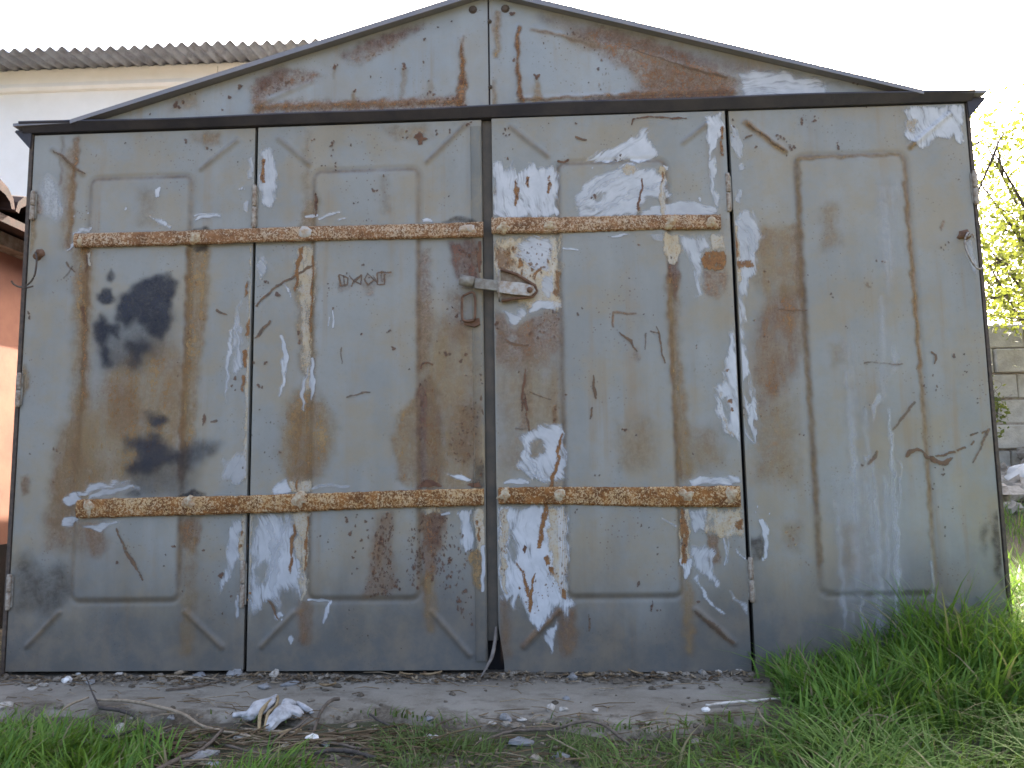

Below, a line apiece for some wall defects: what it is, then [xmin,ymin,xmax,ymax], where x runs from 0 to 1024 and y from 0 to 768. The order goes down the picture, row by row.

corrosion [253,44,468,113]
corrosion [494,12,569,102]
corrosion [567,28,734,100]
corrosion [451,241,482,278]
peeling [735,233,754,269]
peeling [549,433,563,487]
peeling [288,516,309,574]
corrosion [345,512,473,626]
peeling [522,504,554,575]